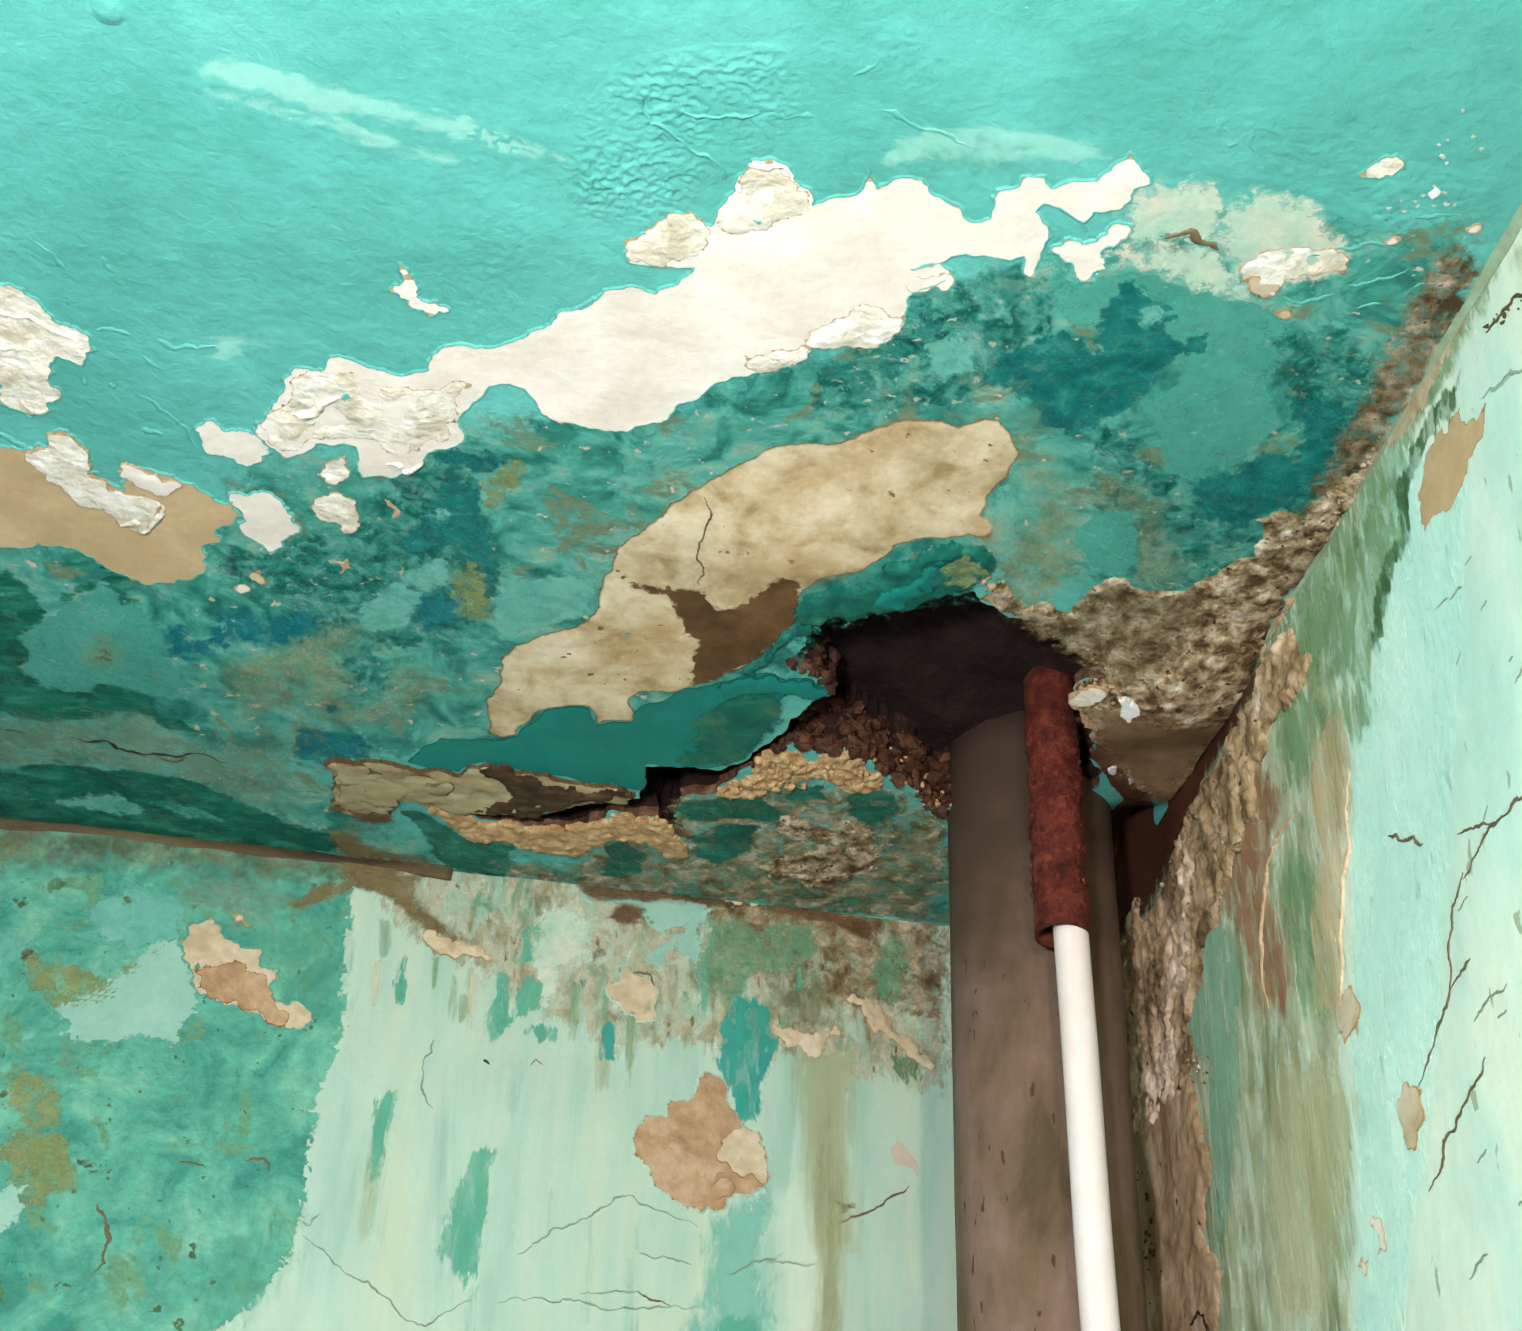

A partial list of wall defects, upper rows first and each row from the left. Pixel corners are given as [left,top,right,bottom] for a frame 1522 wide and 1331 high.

peeling [0,150,1349,586]
crack [1483,293,1522,333]
damp [0,210,1484,1093]
peeling [485,419,1019,738]
flaking render [323,757,688,859]
flaking render [980,463,1368,1331]
crack [1388,796,1522,1088]
damp [89,1204,112,1278]
crack [301,1195,701,1327]
damp [691,1202,769,1331]
damp [802,1051,852,1331]
crack [1429,1057,1487,1191]